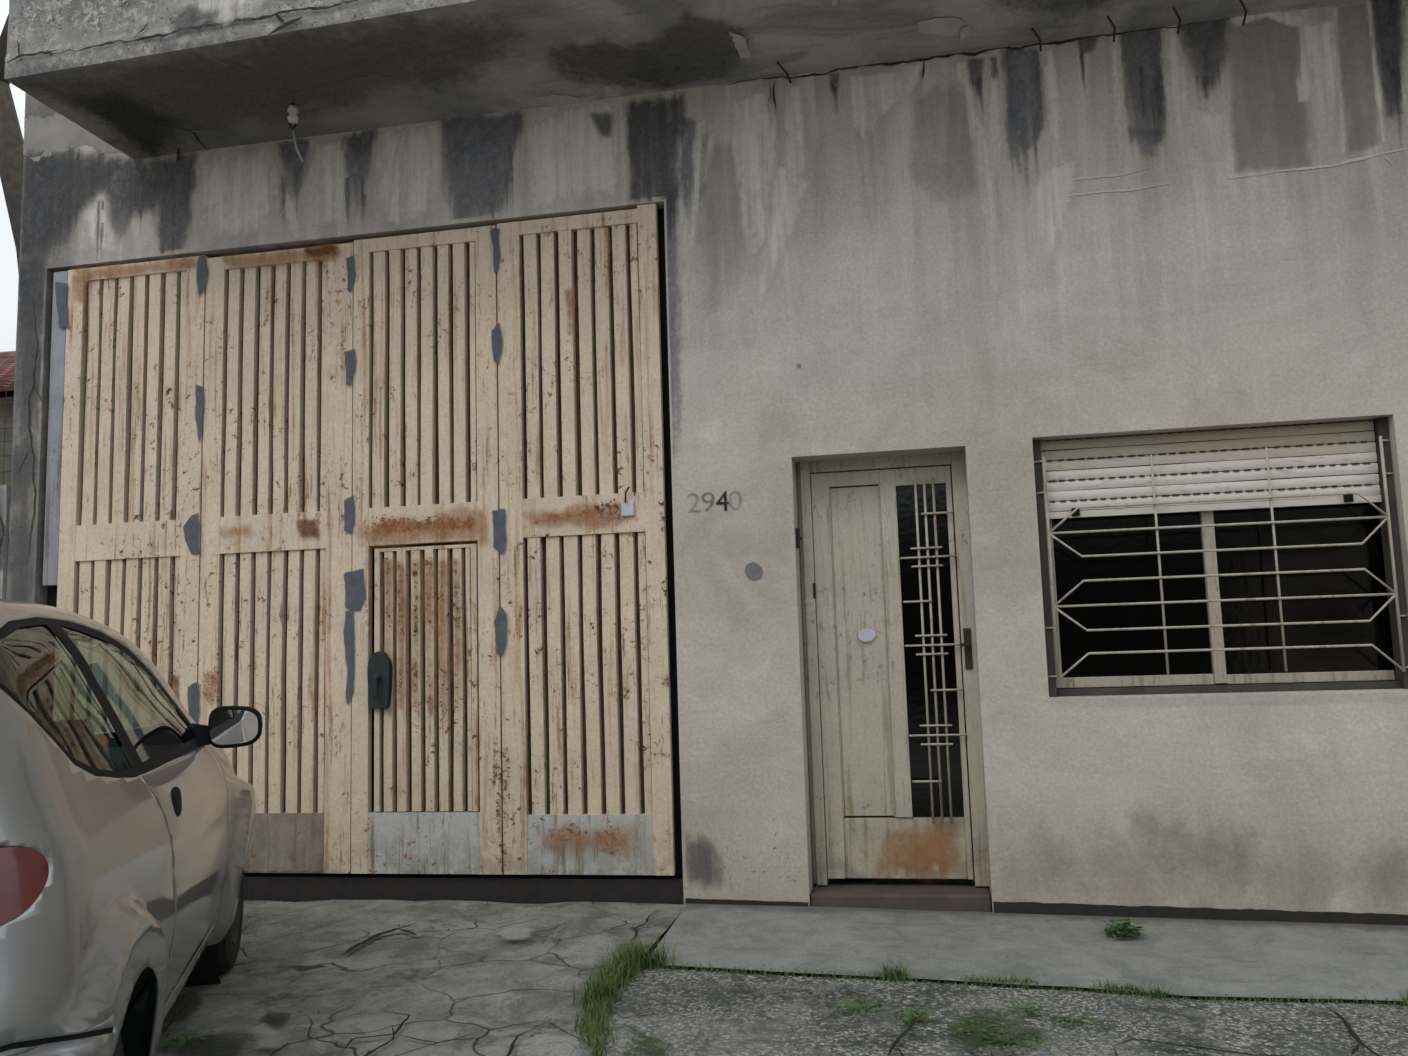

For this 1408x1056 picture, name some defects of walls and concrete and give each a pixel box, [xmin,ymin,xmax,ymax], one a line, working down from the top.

crack [5,0,359,64]
damp [1078,8,1346,164]
damp [1367,0,1407,142]
damp [956,47,1076,273]
damp [12,15,807,602]
corrosion [371,513,485,542]
corrosion [384,557,460,730]
corrosion [532,823,628,855]
crack [341,923,417,956]
crack [342,1009,479,1056]
crack [506,1019,552,1056]
crack [887,1014,919,1056]